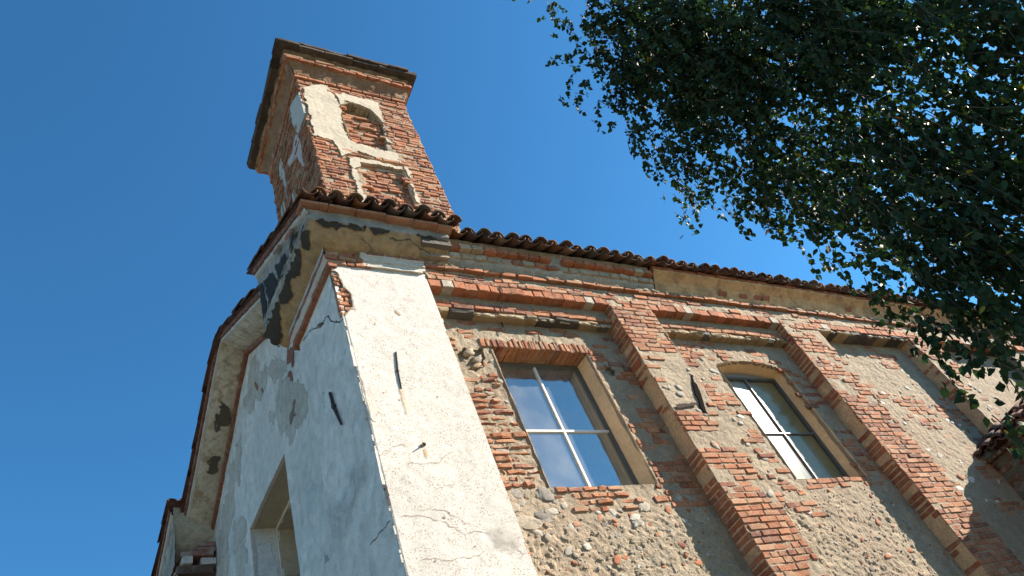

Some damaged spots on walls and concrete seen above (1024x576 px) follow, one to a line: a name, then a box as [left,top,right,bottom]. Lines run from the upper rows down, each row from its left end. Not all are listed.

crack [303,315,343,340]
flaking render [329,270,356,319]
peeling [243,347,308,446]
crack [370,444,488,561]